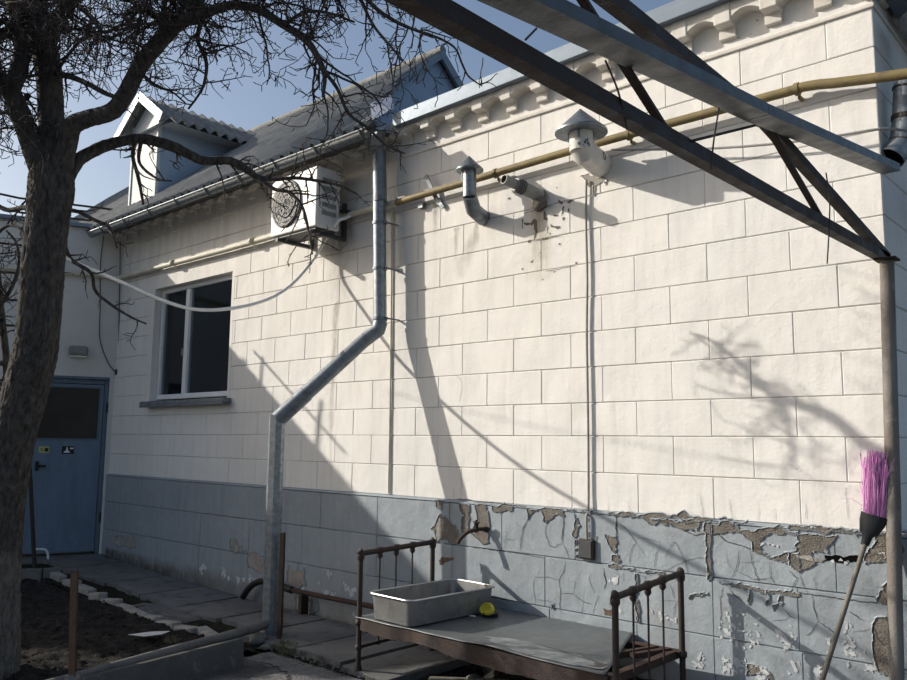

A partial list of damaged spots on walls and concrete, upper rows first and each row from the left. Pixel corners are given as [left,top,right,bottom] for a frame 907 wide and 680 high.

peeling [287,565,357,615]
crack [449,490,888,654]
spalling [526,507,862,573]
spalling [862,531,887,564]
peeling [718,588,783,680]
peeling [775,625,797,651]
peeling [787,660,823,679]
spalling [825,580,889,676]